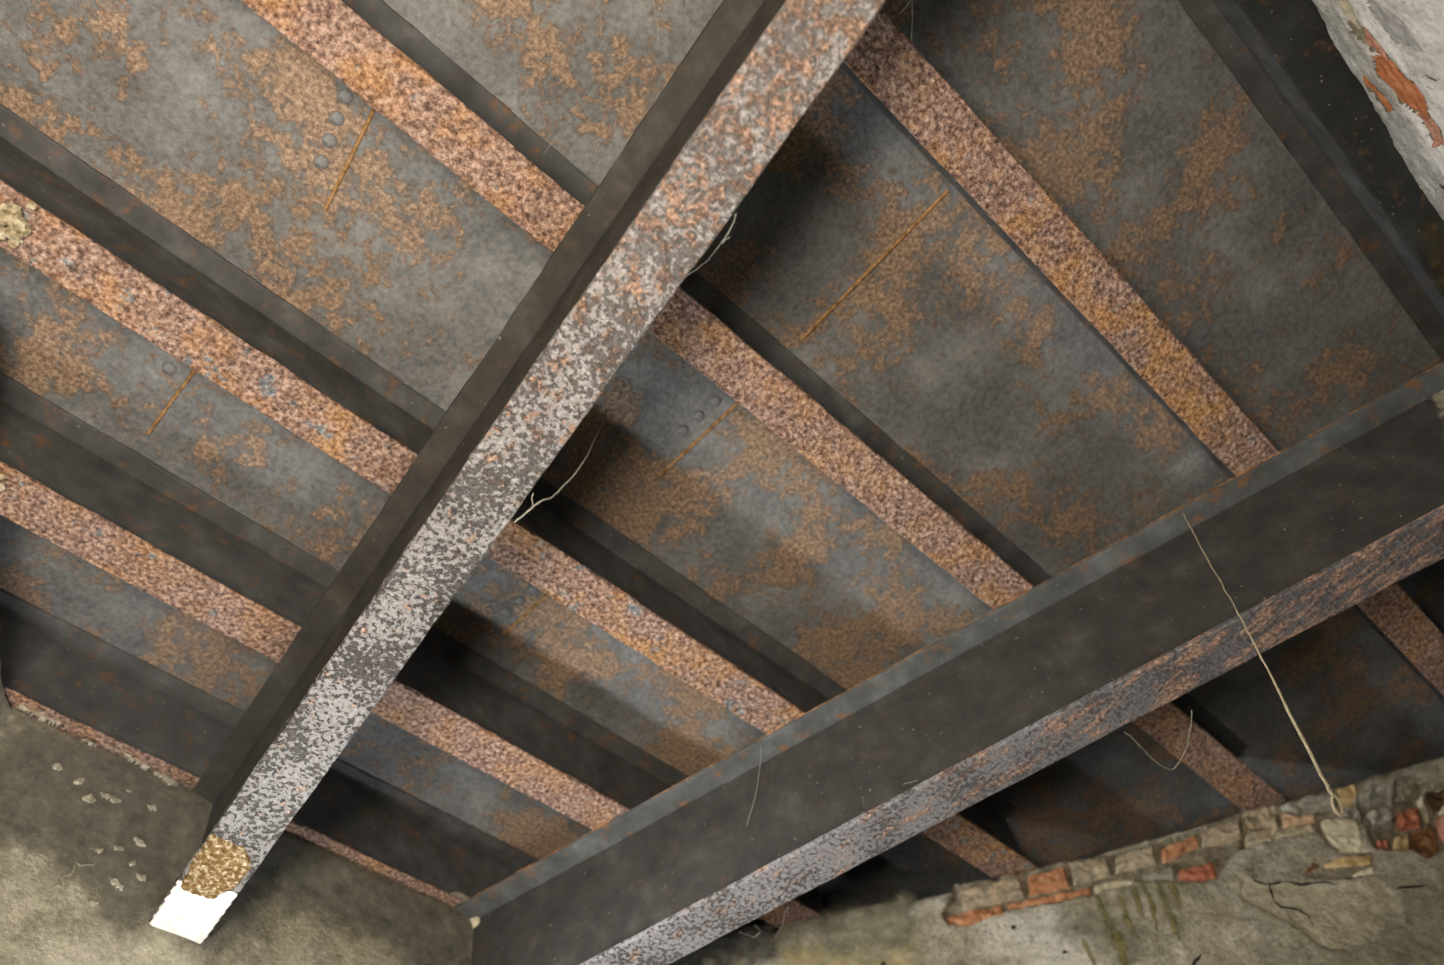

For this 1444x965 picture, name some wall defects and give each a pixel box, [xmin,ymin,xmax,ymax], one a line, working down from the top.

flaking render [1338,0,1444,148]
flaking render [941,776,1444,952]
crack [1249,875,1337,926]
crack [1397,882,1428,890]